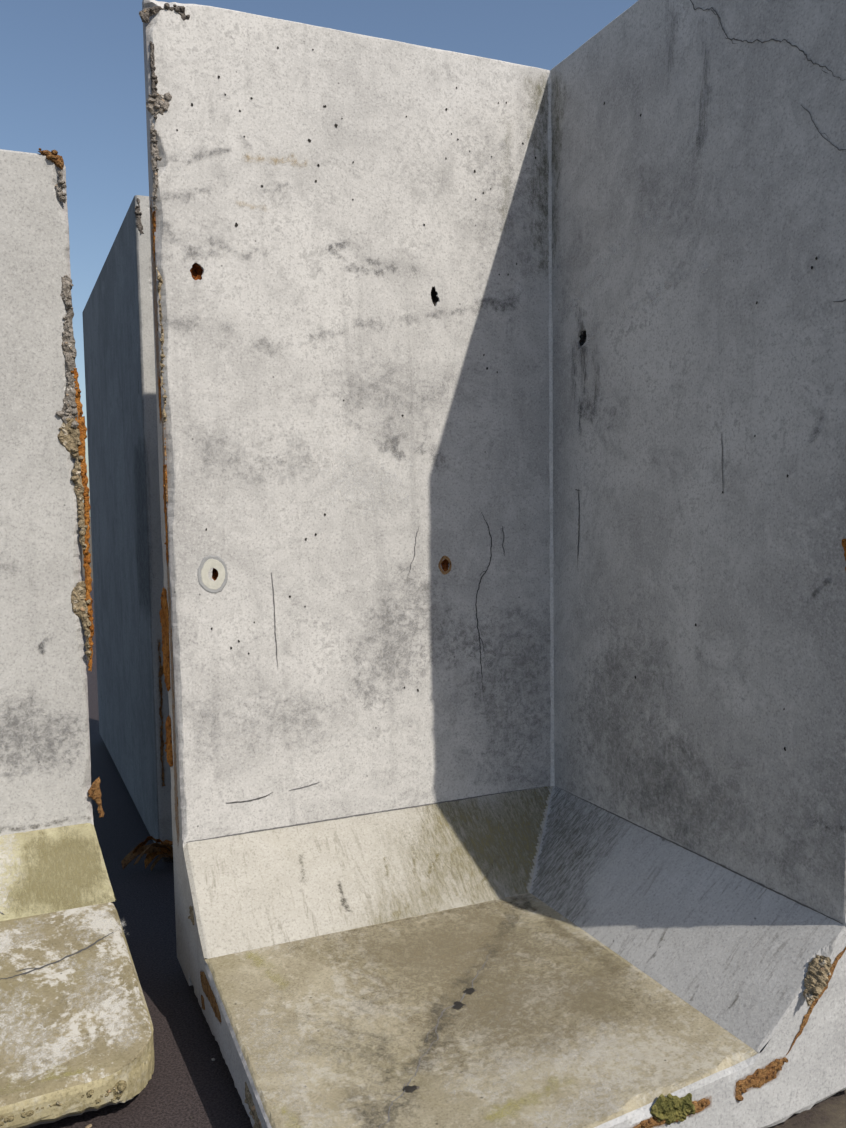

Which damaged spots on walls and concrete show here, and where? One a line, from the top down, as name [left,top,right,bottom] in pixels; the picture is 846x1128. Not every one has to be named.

crack [690,0,845,80]
crack [801,105,846,150]
rust [71,368,94,671]
rust [150,197,179,842]
crack [475,512,505,687]
damp [327,786,651,1071]
crack [1,932,113,979]
rust [200,971,222,1023]
spalling [803,955,832,1007]
spalling [244,1082,262,1128]
rust [634,1093,710,1128]
rust [735,1057,788,1101]